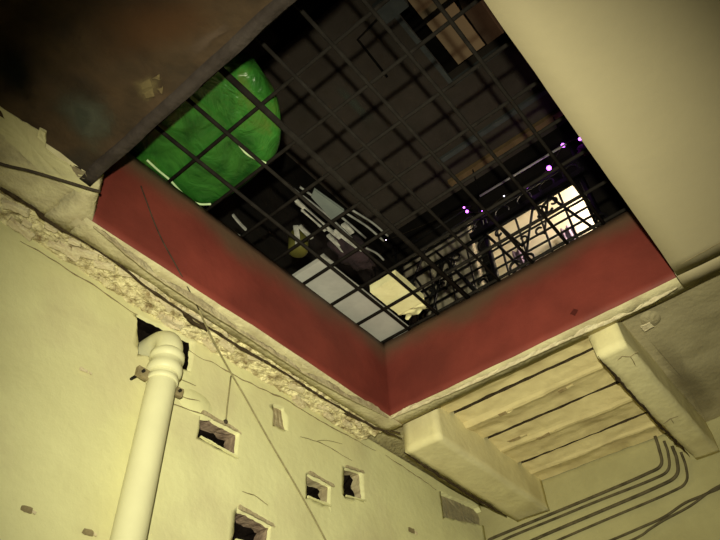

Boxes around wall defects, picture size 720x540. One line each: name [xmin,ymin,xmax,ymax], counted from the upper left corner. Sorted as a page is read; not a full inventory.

spalling [0,190,678,441]
spalling [198,410,242,459]
spalling [306,465,367,507]
spalling [232,504,275,540]